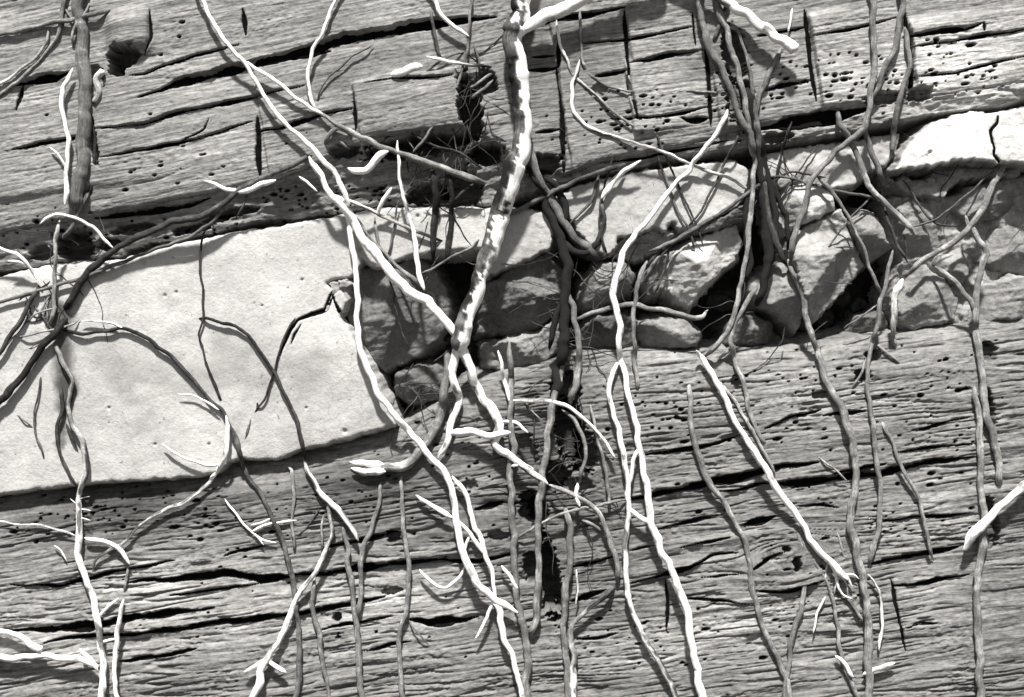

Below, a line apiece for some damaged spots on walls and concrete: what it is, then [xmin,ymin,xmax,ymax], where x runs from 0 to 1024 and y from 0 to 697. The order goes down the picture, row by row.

crack [12,11,497,157]
crack [989,115,1000,168]
crack [279,292,350,356]
crack [571,417,973,605]
crack [11,530,511,662]